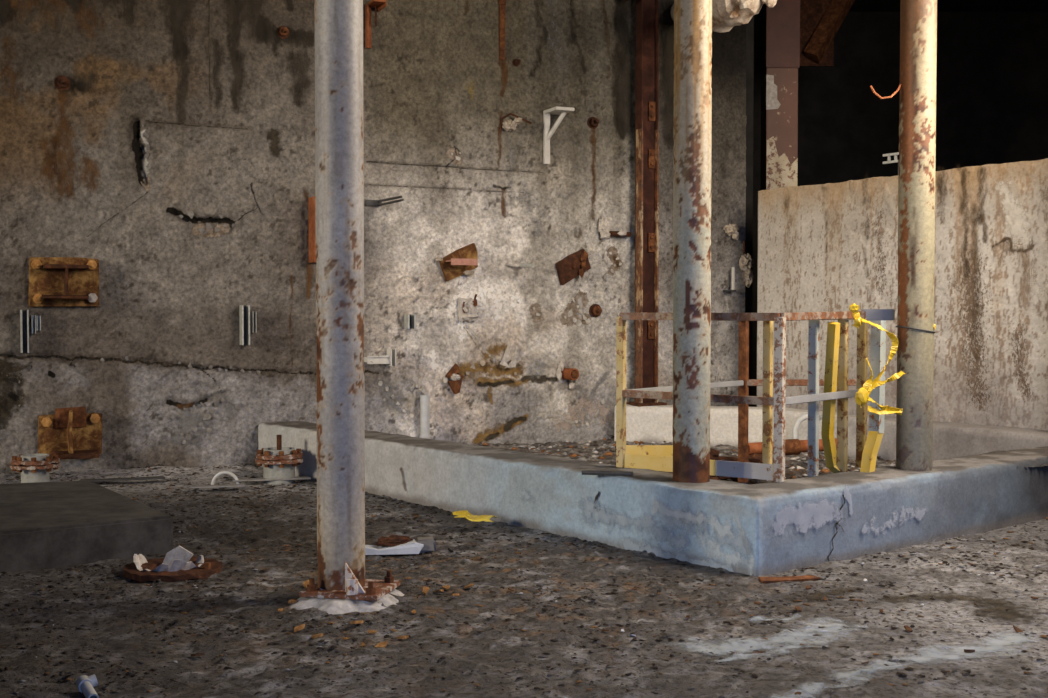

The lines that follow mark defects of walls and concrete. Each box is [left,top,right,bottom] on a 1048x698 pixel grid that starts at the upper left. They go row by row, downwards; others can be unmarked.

water stain [165,0,193,123]
water stain [213,0,315,111]
water stain [871,206,887,293]
water stain [0,356,27,429]
crack [0,354,316,410]
water stain [949,249,997,419]
water stain [1009,324,1036,402]
crack [827,495,845,561]